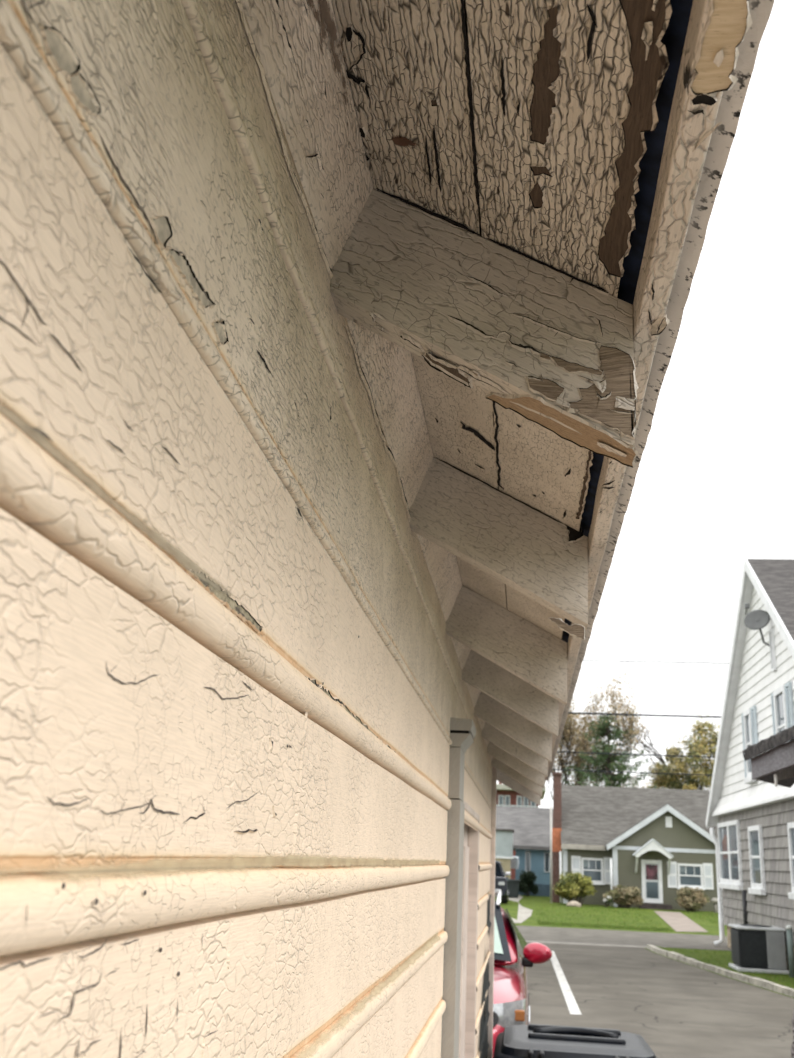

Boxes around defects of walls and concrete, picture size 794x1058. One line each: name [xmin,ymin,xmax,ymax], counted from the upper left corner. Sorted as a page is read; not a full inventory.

peeling [304,0,349,111]
peeling [528,3,566,145]
peeling [685,0,753,95]
peeling [529,163,554,209]
peeling [597,0,672,278]
crack [376,0,610,524]
peeling [421,350,473,389]
peeling [485,345,639,519]
crack [48,792,277,834]
crack [0,957,53,970]
crack [39,939,148,1058]